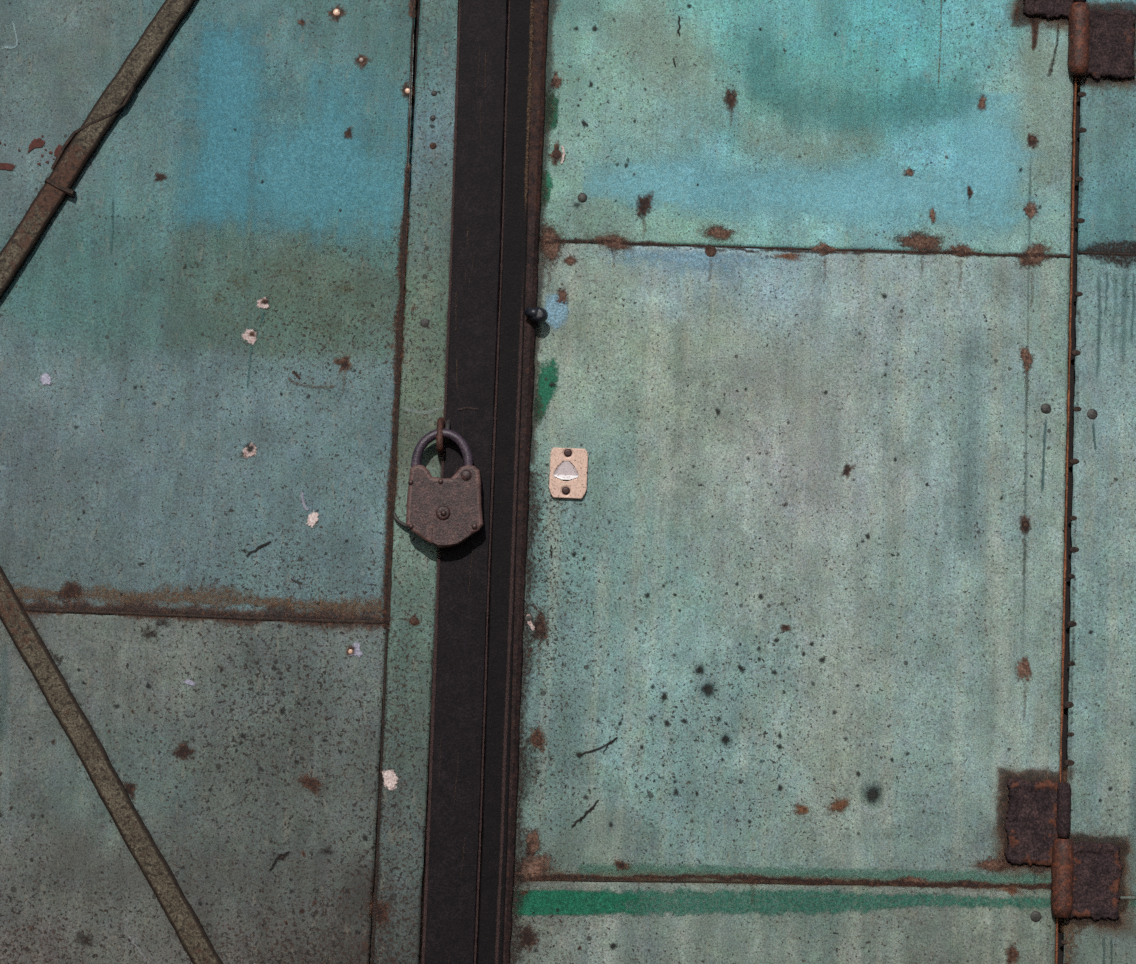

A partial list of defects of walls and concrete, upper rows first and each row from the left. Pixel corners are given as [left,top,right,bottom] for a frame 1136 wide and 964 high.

rust [1013,0,1069,76]
rust [1083,1,1136,85]
rust [722,89,737,110]
rust [525,0,675,307]
rust [696,208,1067,267]
rust [1024,202,1038,219]
peeling [242,329,256,344]
rust [12,164,410,761]
rust [474,0,510,964]
rust [495,308,1065,964]
peeling [382,770,397,790]
rust [1061,833,1129,964]